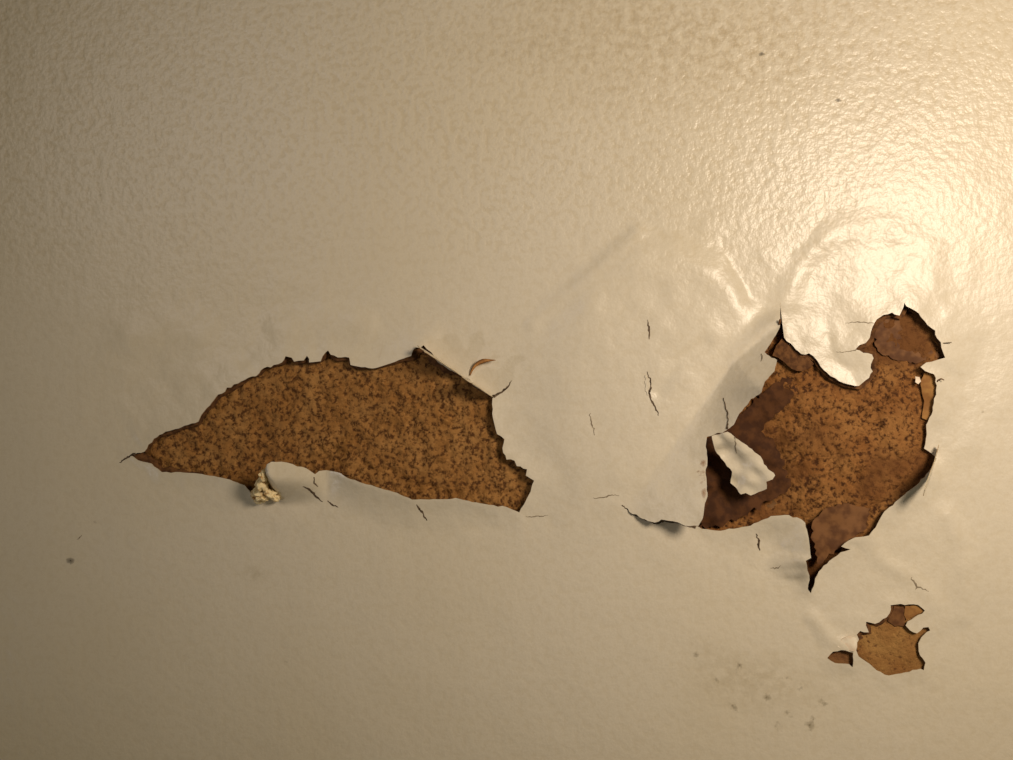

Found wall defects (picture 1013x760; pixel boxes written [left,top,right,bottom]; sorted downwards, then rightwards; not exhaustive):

peeling [81,345,534,560]
peeling [586,304,1013,727]